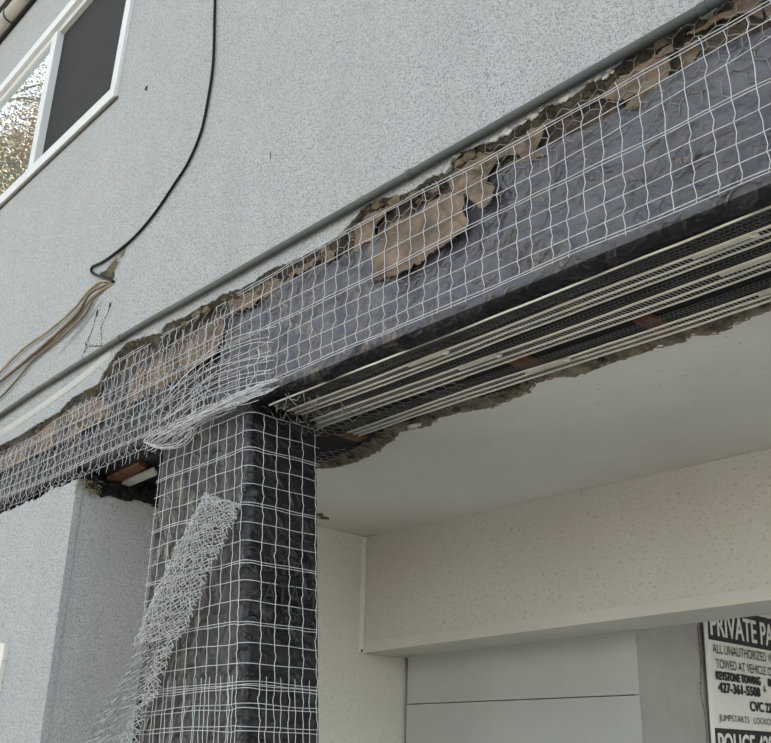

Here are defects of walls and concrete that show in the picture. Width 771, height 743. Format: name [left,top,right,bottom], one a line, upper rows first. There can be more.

flaking render [0,0,734,455]
flaking render [316,297,771,469]